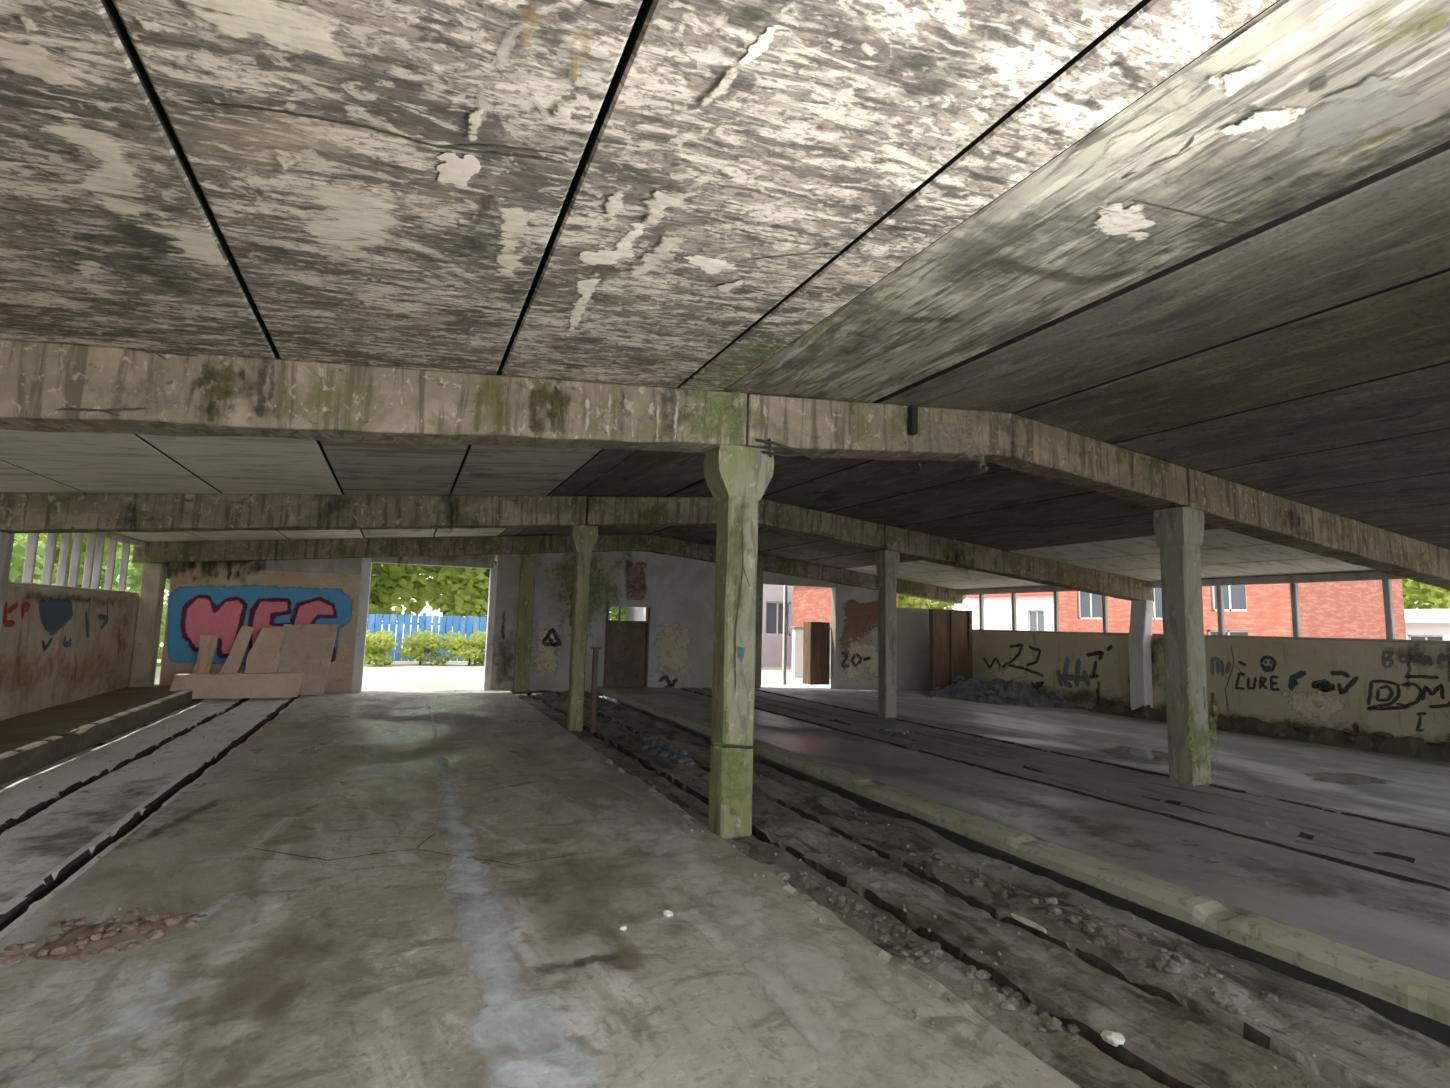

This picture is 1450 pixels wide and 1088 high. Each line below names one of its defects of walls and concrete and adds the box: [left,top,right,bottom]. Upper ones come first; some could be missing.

peeling [1207,0,1299,58]
peeling [695,27,775,112]
peeling [1209,62,1267,96]
peeling [437,109,484,187]
peeling [1095,112,1192,173]
peeling [566,191,744,337]
leakage [916,193,969,211]
leakage [969,175,1008,185]
leakage [947,216,1125,284]
peeling [1094,203,1156,240]
leakage [530,386,560,431]
leakage [656,386,708,439]